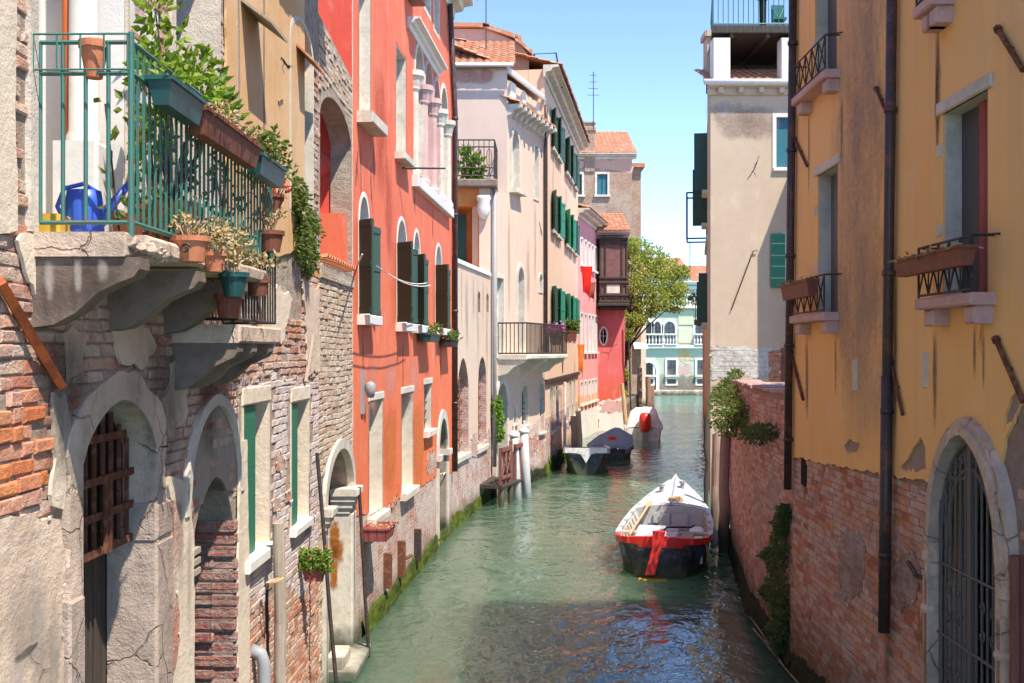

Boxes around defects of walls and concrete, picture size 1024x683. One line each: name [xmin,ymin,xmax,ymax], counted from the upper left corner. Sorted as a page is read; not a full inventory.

flaking render [846,440,860,453]
flaking render [903,439,926,472]
flaking render [0,388,67,683]
corrosion [330,521,343,587]
spalling [836,529,866,604]
spalling [894,549,921,614]